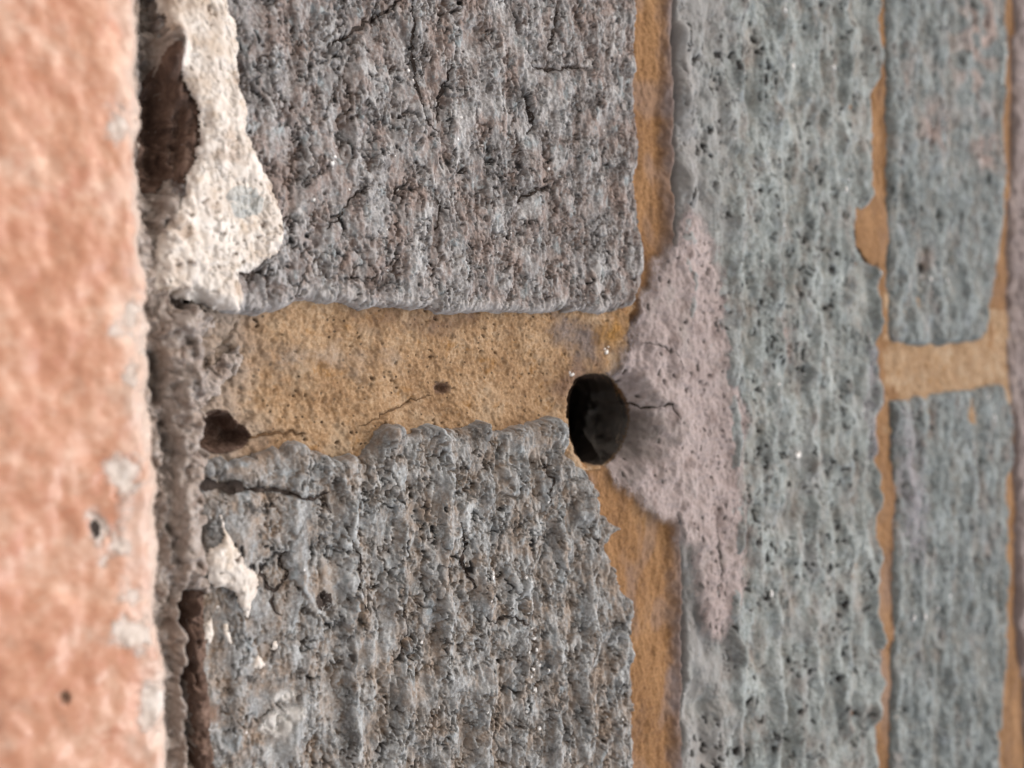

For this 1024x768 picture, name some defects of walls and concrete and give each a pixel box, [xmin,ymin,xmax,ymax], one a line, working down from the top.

spalling [174,307,251,460]
crack [598,342,683,419]
spalling [187,481,207,581]